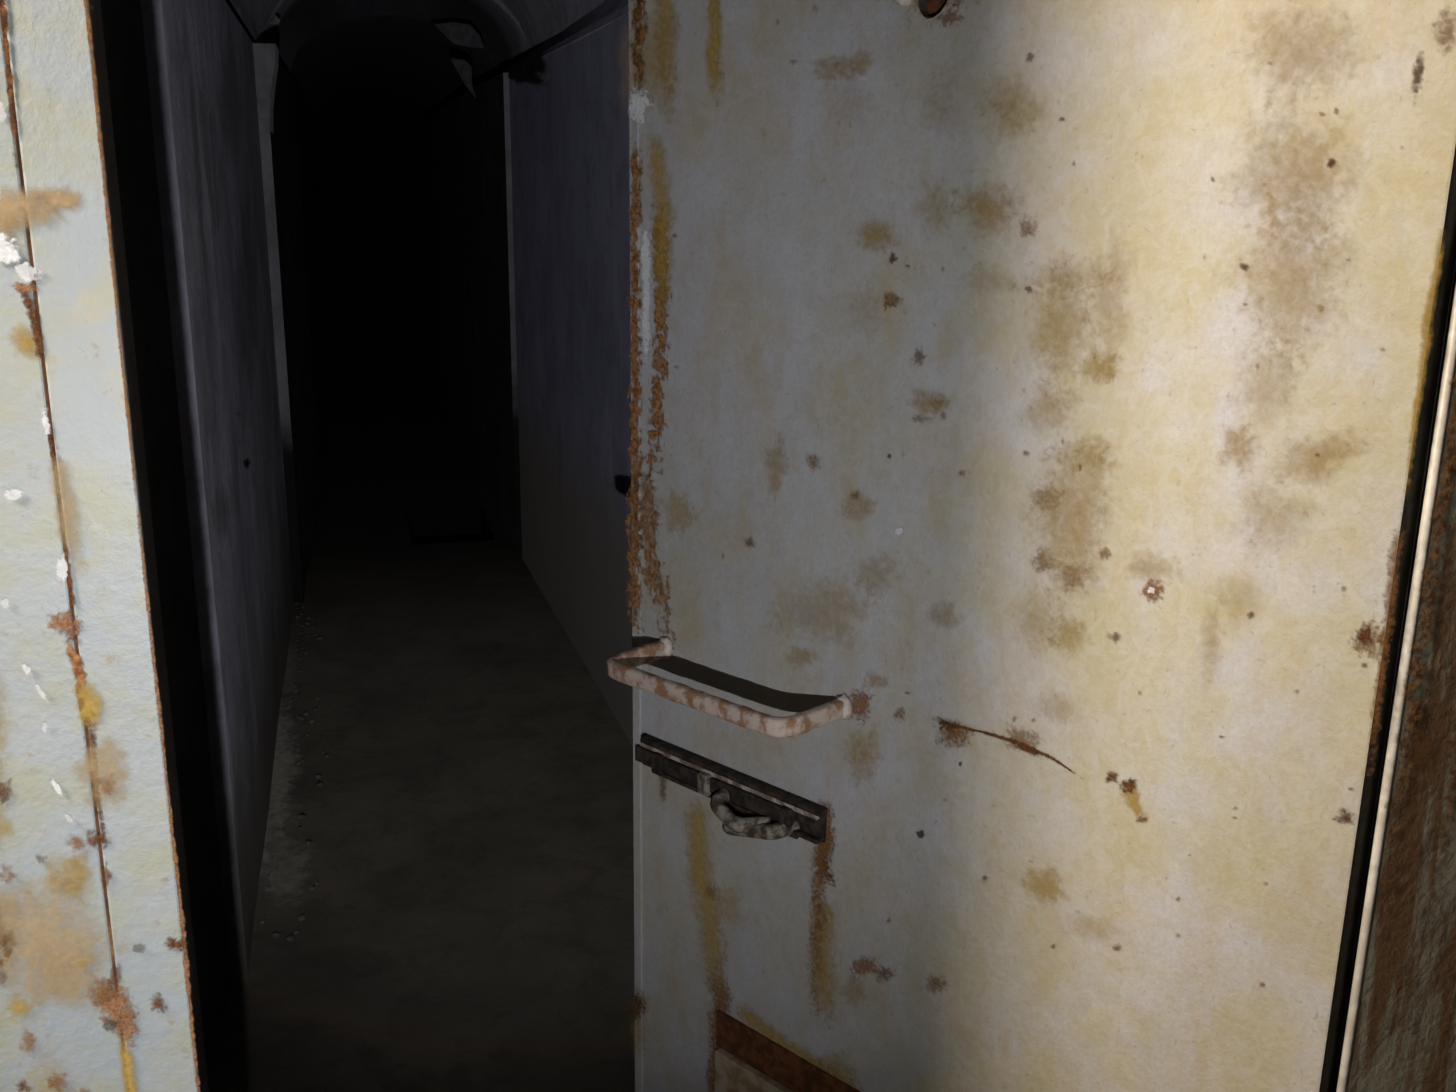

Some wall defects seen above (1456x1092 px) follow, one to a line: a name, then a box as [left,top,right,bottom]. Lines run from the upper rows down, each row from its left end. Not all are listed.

corrosion [1,0,17,138]
corrosion [630,0,676,93]
corrosion [707,0,721,88]
corrosion [625,145,688,649]
corrosion [1410,246,1442,457]
corrosion [48,612,124,850]
corrosion [1354,541,1401,721]
corrosion [1385,377,1456,837]
corrosion [102,868,111,888]
corrosion [91,968,138,1092]
corrosion [690,811,837,1092]
corrosion [810,804,876,1006]